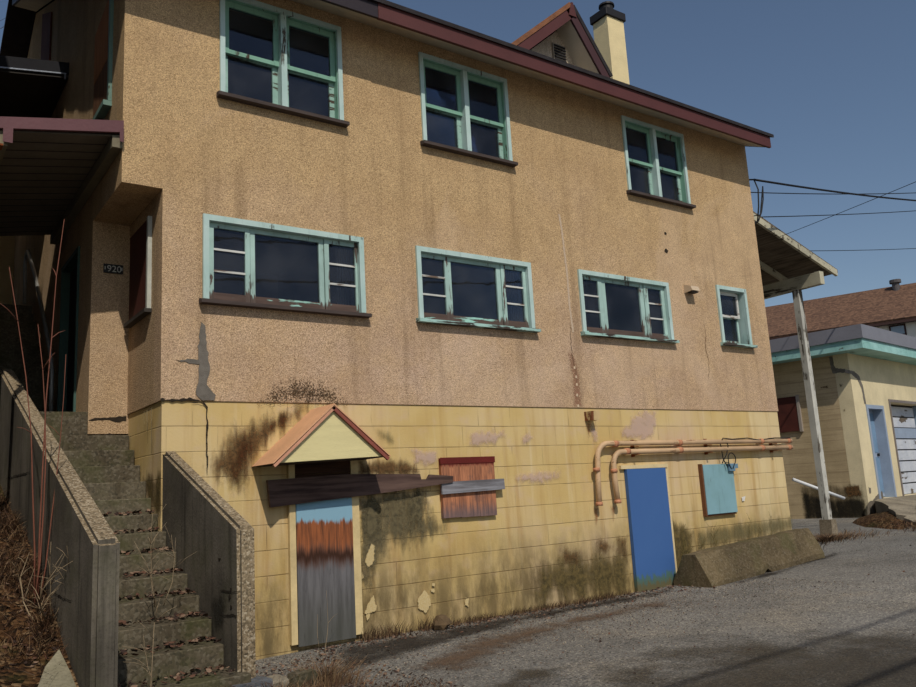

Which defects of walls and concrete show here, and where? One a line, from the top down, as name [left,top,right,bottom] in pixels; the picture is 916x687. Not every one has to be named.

crack [161,397,209,469]
mould [215,377,348,486]
peeling [361,544,375,579]
leakage [361,490,438,583]
leakage [600,538,626,555]
peeling [364,595,377,620]
peeling [418,583,435,613]